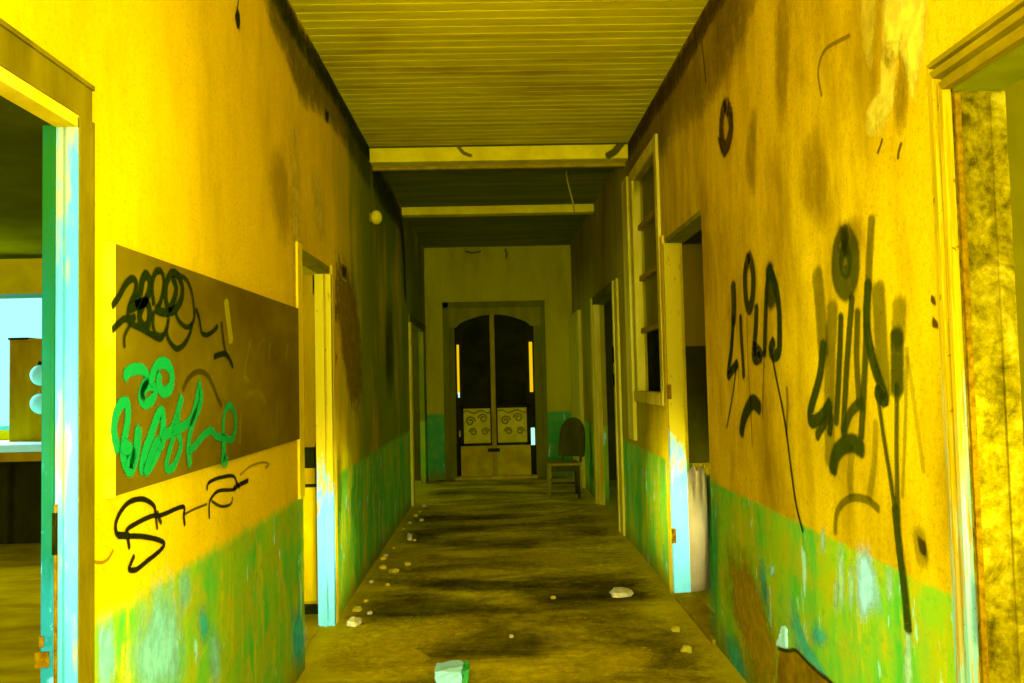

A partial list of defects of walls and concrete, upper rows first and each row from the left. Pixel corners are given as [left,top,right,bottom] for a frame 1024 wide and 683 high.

damp [270,0,406,299]
damp [371,574,639,617]
peeling [710,508,833,683]
peeling [834,553,893,615]